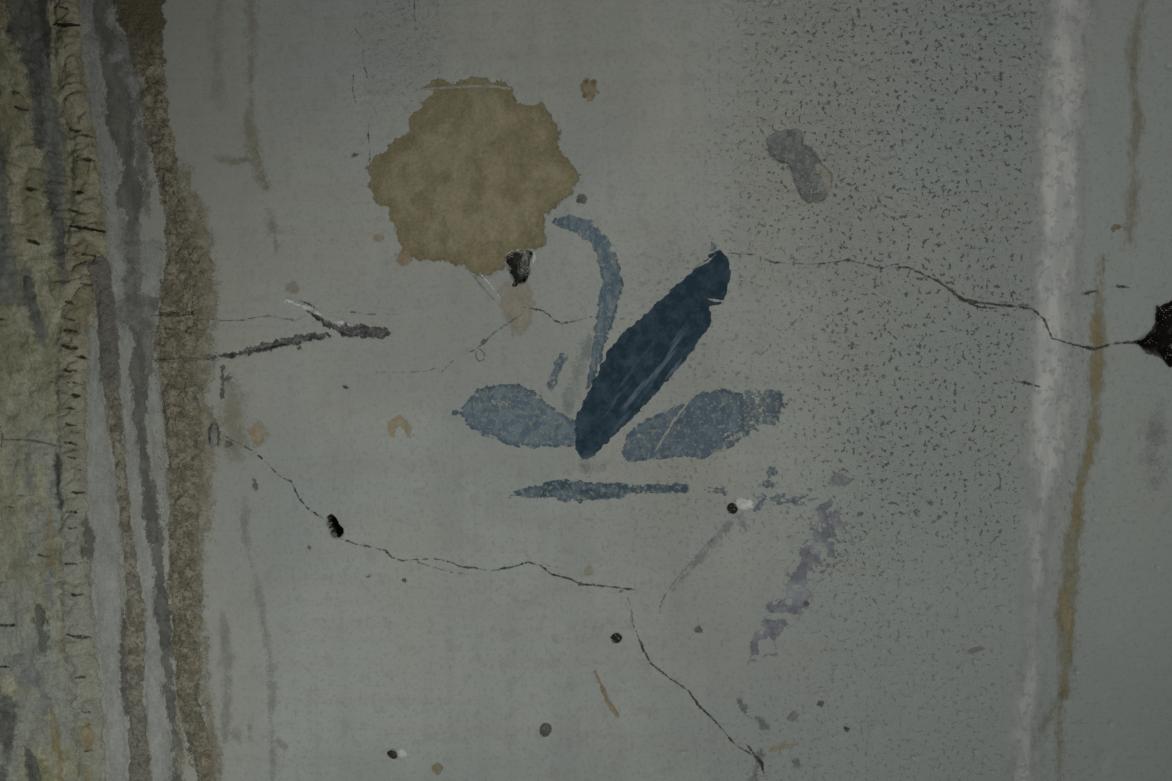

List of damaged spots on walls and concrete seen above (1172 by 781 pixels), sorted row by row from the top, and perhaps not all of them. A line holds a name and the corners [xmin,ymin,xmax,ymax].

leakage [0,130,49,346]
leakage [6,0,71,283]
leakage [54,454,64,510]
leakage [78,0,181,781]
crack [151,299,391,361]
crack [226,437,323,519]
spalling [365,77,587,279]
crack [732,253,1137,350]
corrosion [1056,290,1105,698]
leakage [0,696,41,781]
leakage [16,571,55,726]
crack [345,540,764,771]